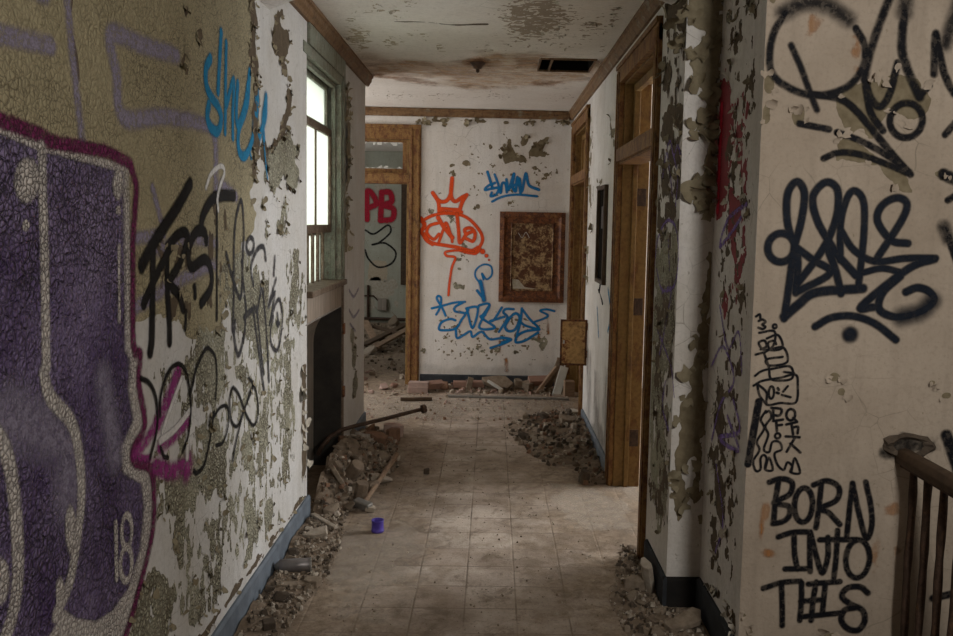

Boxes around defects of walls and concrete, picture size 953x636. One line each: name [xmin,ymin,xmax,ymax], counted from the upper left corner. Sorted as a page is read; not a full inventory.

peeling [344,0,446,57]
peeling [476,0,622,55]
peeling [415,116,449,127]
peeling [345,80,355,252]
peeling [440,115,570,210]
peeling [0,0,313,636]
peeling [350,328,358,398]
peeling [364,260,400,315]
peeling [435,310,548,361]
peeling [648,0,809,581]
peeling [703,582,753,636]